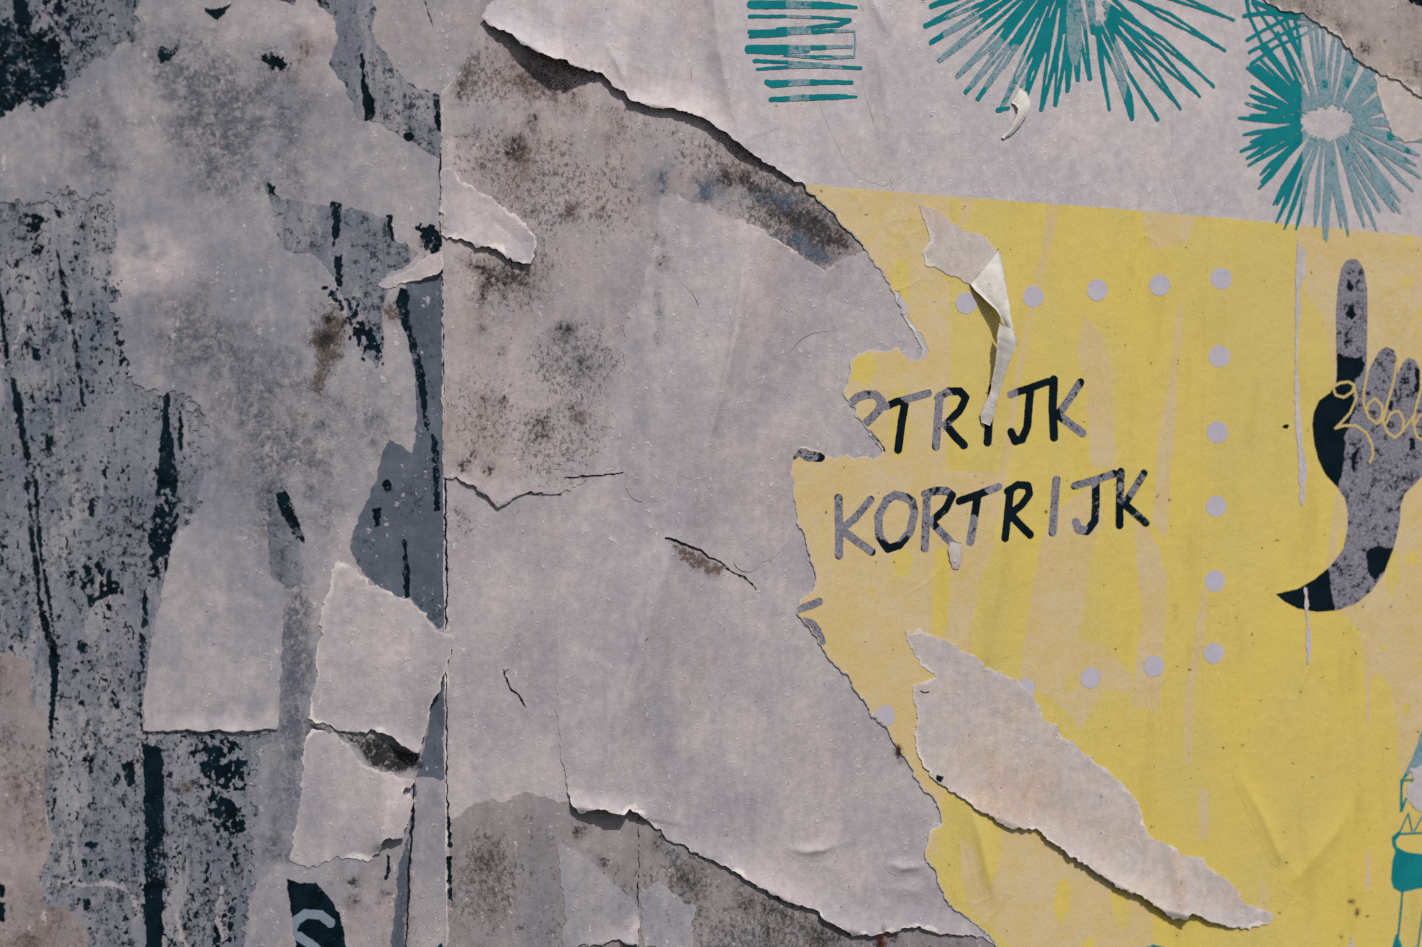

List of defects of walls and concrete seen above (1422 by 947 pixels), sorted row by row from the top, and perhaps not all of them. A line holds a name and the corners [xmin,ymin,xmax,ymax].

leakage [359,53,375,120]
peeling [481,0,835,207]
peeling [1265,0,1422,97]
leakage [383,20,866,511]
peeling [390,675,445,947]
peeling [905,628,1274,929]